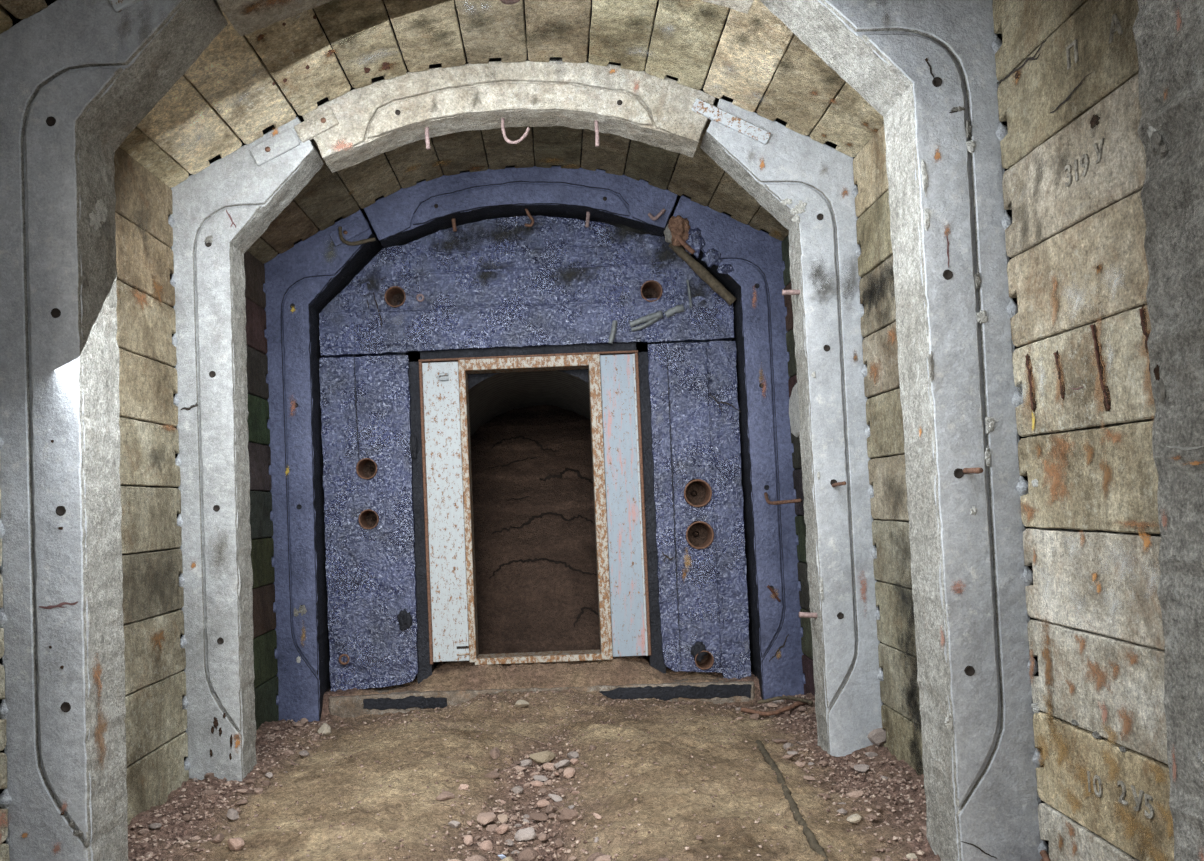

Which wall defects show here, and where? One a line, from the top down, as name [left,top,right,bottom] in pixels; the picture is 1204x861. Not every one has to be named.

rust [1037,430,1121,502]